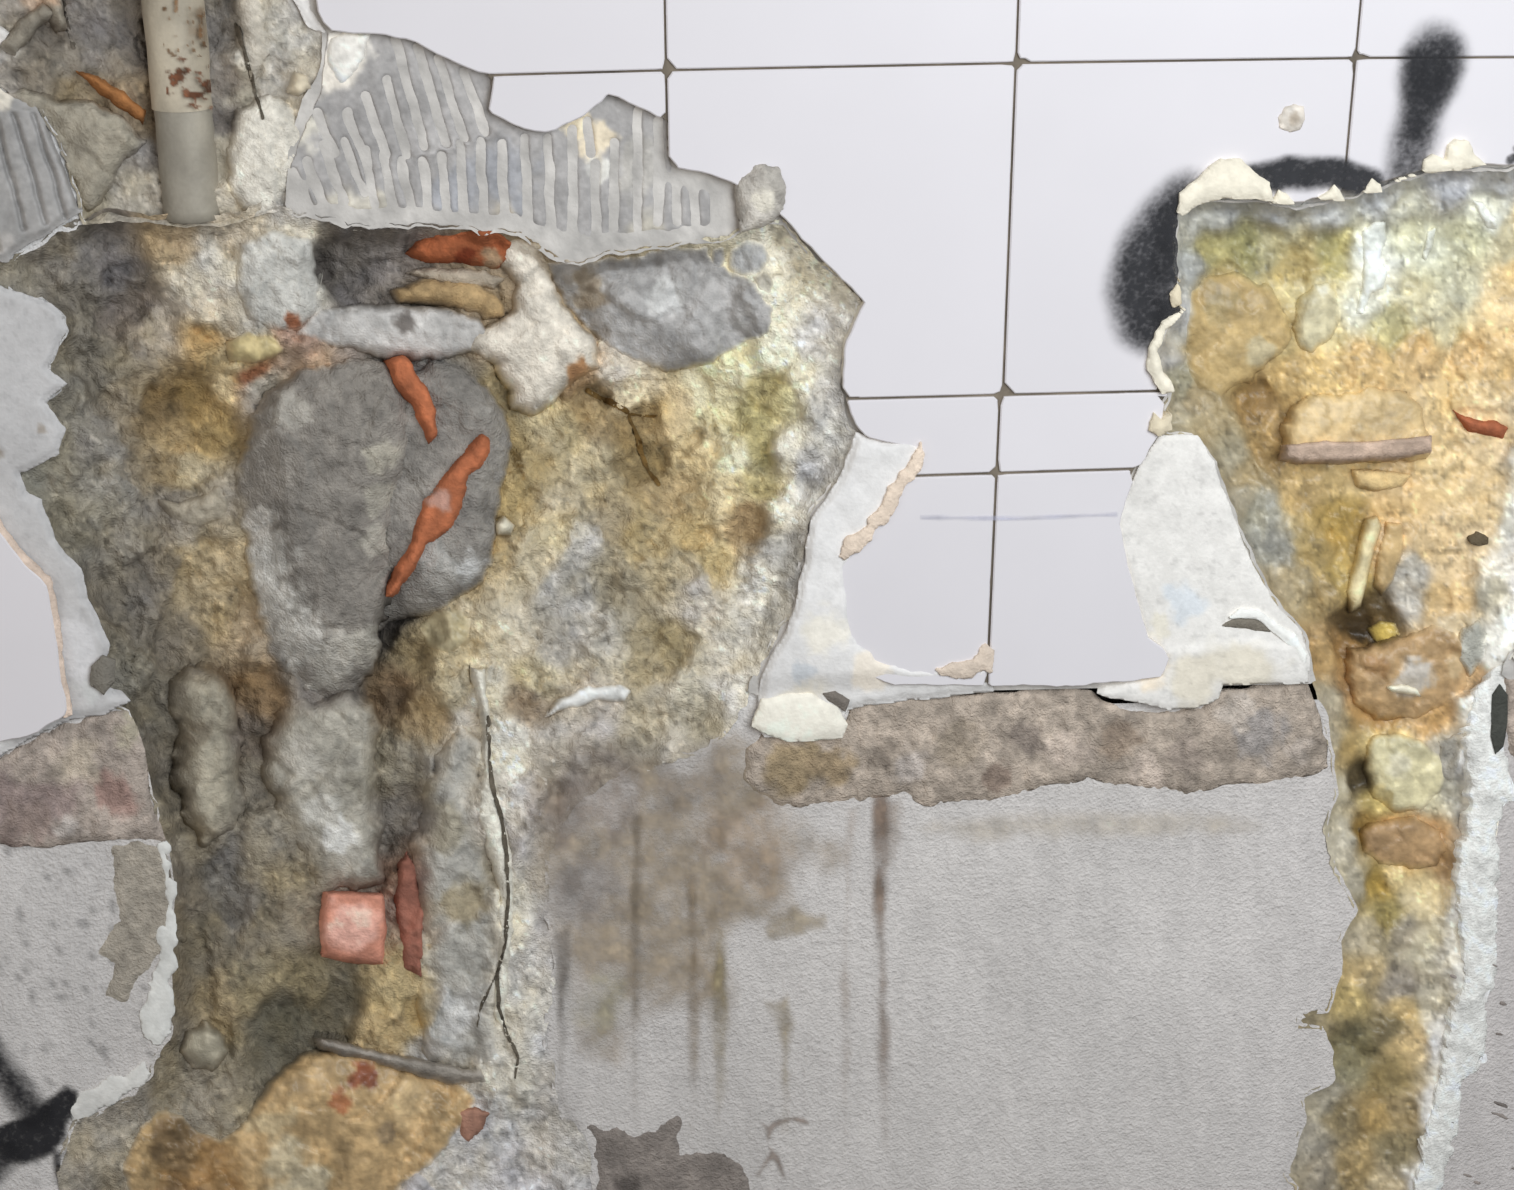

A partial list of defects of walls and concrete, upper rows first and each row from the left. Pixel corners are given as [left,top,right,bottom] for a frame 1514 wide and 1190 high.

spalling [0,0,861,1190]
crack [477,715,519,1079]
leakage [544,747,781,1035]
leakage [875,869,884,915]
leakage [875,795,887,839]
spalling [743,138,1514,1190]